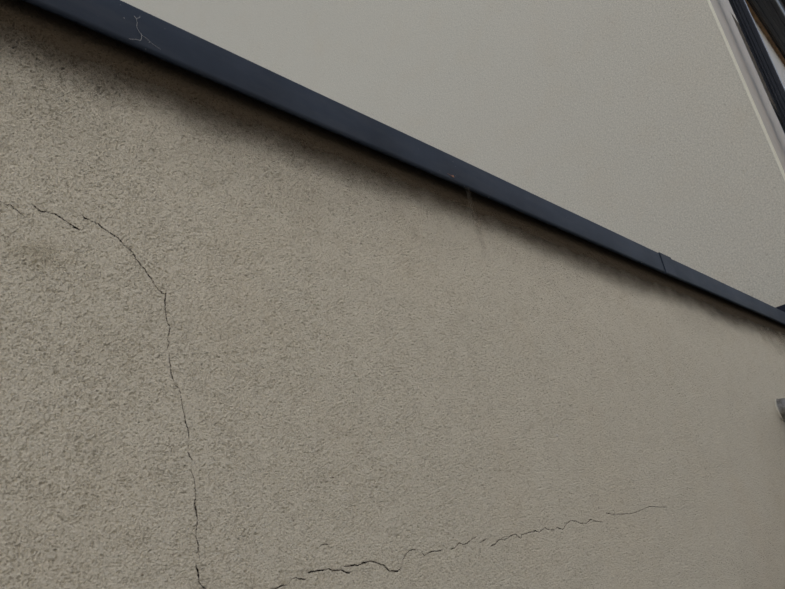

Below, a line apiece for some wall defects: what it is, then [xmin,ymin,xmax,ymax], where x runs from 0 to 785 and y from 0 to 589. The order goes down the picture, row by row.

crack [0,201,205,589]
crack [275,506,655,589]